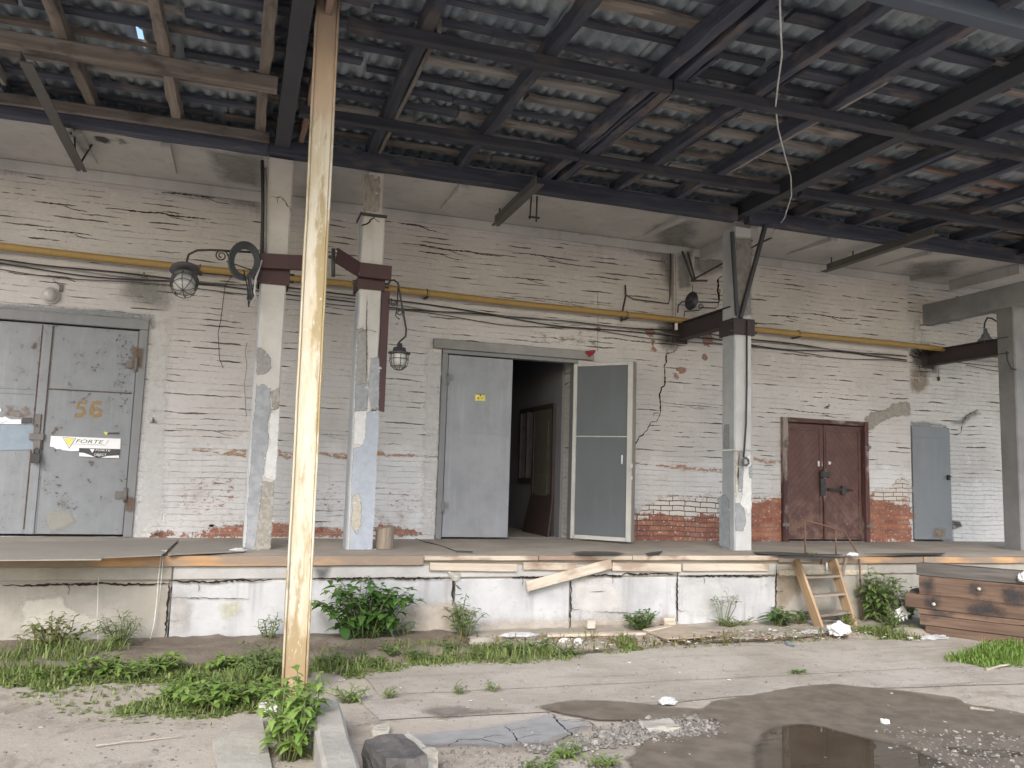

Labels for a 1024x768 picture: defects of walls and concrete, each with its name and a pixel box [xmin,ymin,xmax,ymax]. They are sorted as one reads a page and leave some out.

crack [715,275,723,308]
peeling [148,347,291,550]
peeling [315,326,434,550]
crack [609,337,716,443]
peeling [634,423,781,549]
peeling [863,477,916,542]
crack [448,712,594,747]